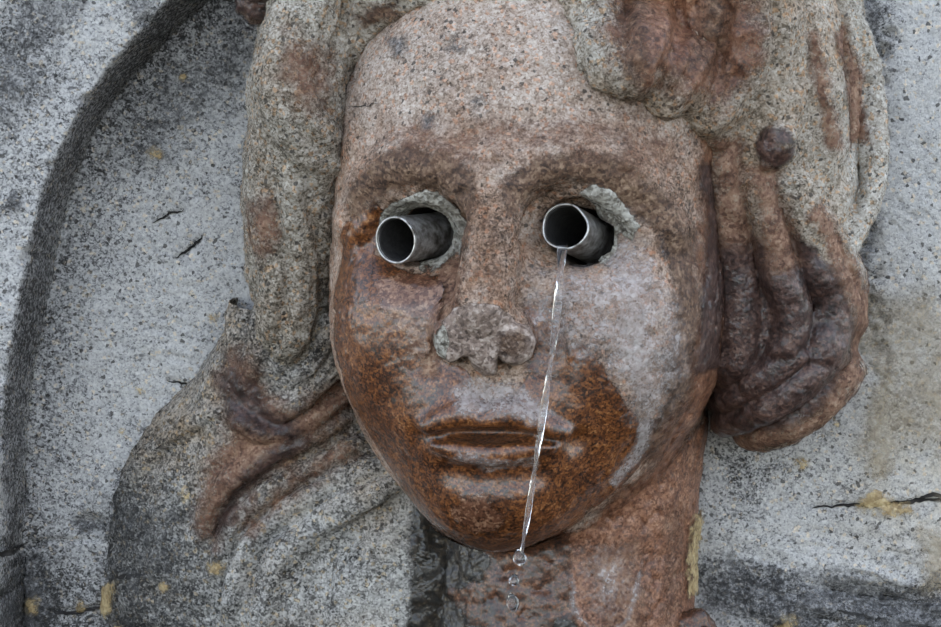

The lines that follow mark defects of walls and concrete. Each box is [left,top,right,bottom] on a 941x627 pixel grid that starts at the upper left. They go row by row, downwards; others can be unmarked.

crack [813,492,941,509]
crack [0,545,24,558]